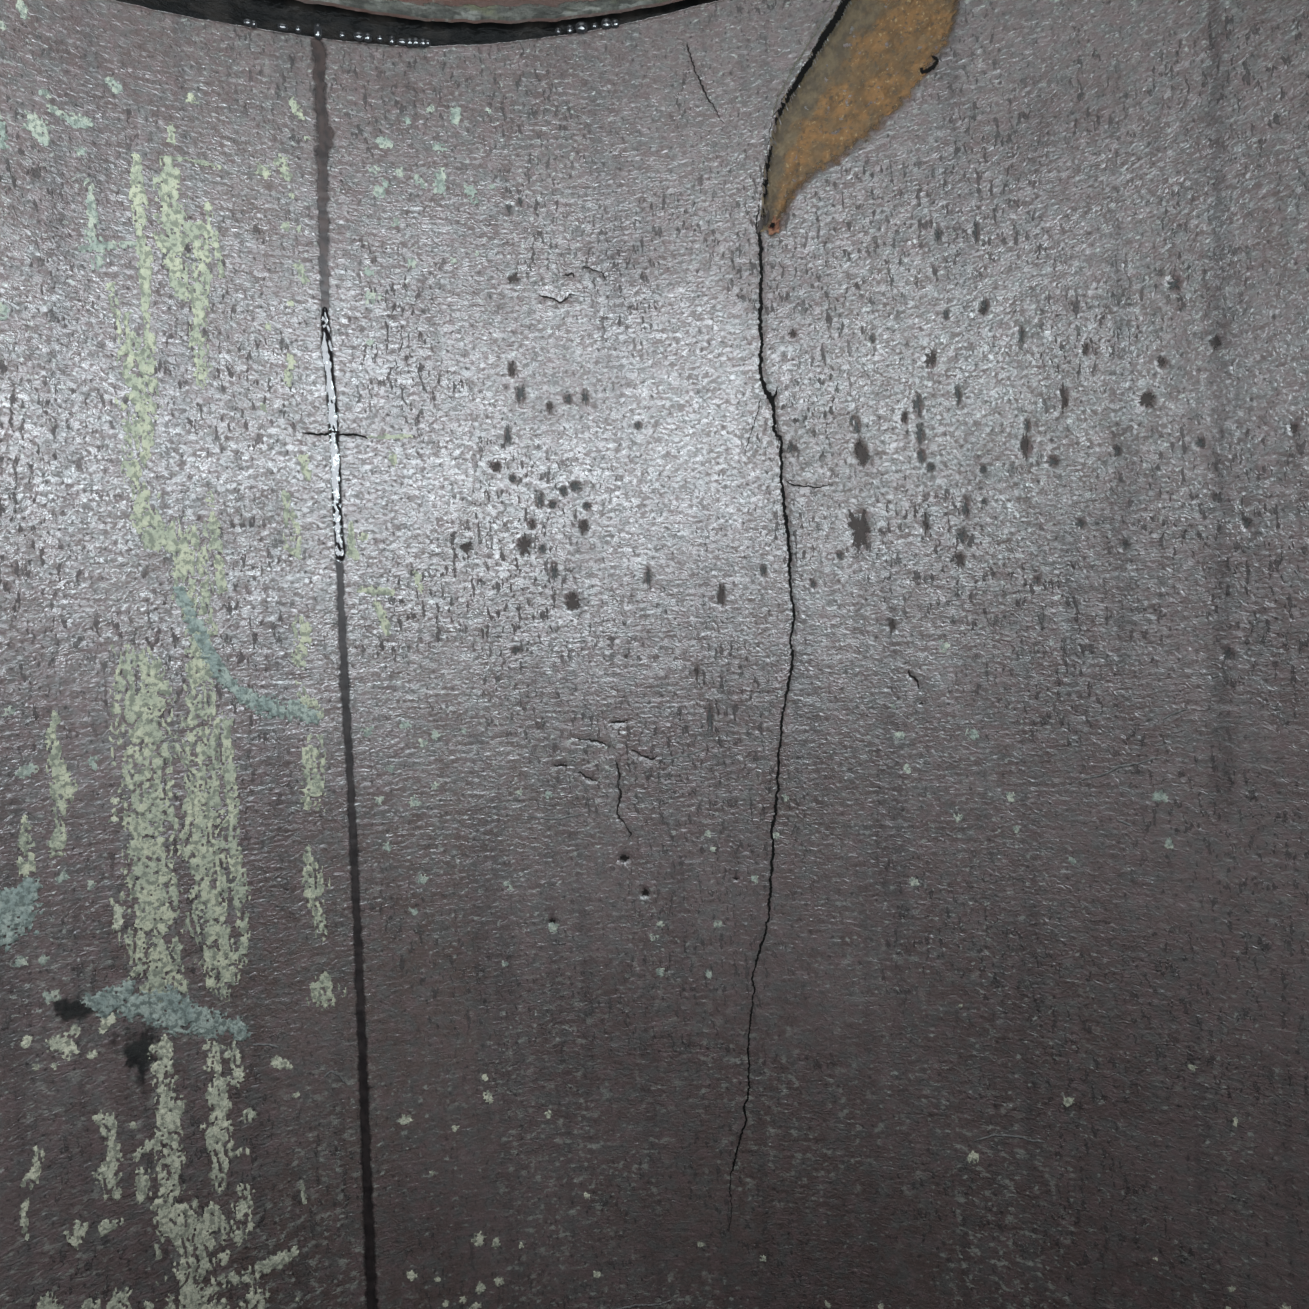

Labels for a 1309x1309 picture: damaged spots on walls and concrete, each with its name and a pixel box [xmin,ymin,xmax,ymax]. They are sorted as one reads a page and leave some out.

spalling [755,0,957,235]
damp [78,152,252,1008]
damp [17,710,78,877]
crack [729,215,829,1228]
damp [54,998,93,1020]
damp [19,1145,45,1241]
damp [63,1218,124,1250]
damp [80,1027,299,1309]